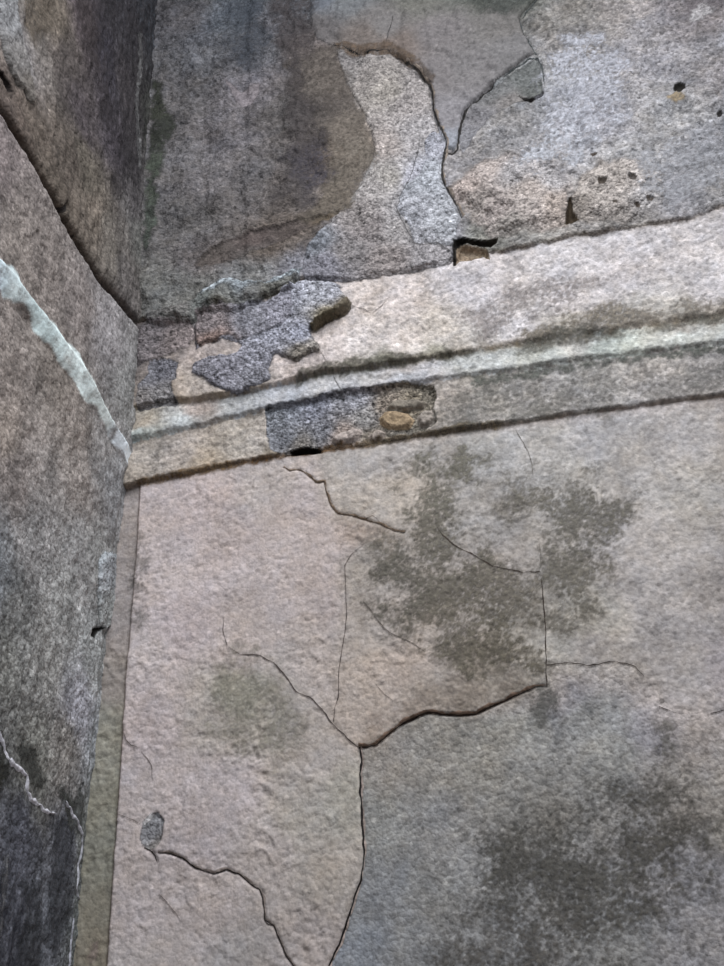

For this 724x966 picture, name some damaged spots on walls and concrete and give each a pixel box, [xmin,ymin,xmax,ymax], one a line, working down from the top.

spalling [135,0,543,412]
damp [138,454,287,485]
crack [284,466,405,533]
spalling [265,380,437,457]
damp [322,416,503,453]
damp [360,445,636,681]
crack [223,530,644,966]
crack [144,847,296,966]
damp [430,778,721,966]